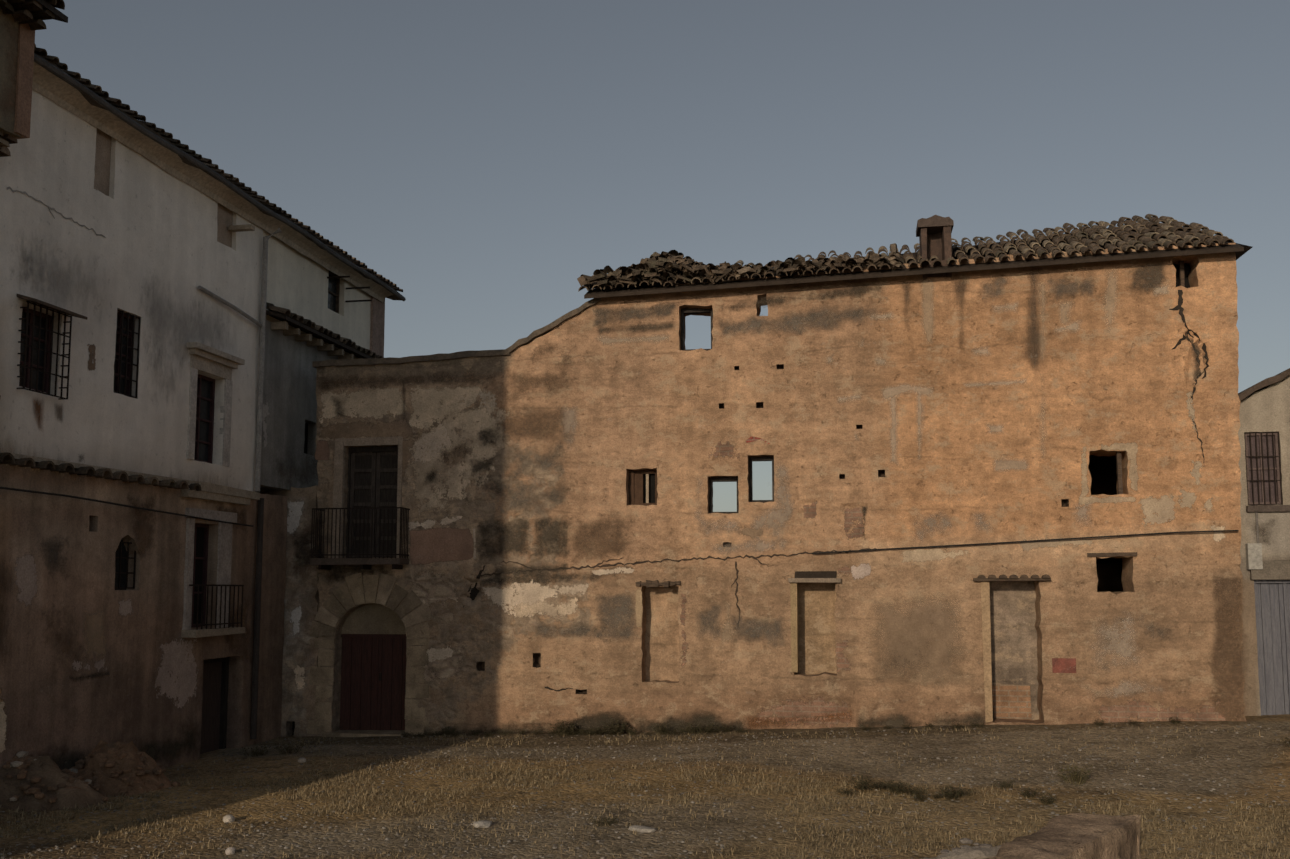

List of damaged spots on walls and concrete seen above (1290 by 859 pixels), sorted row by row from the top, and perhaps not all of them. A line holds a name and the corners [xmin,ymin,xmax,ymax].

crack [1169,290,1209,463]
peeling [318,383,634,626]
flaking render [635,590,643,627]
crack [480,548,876,622]
peeling [153,636,199,708]
flaking render [423,645,485,683]